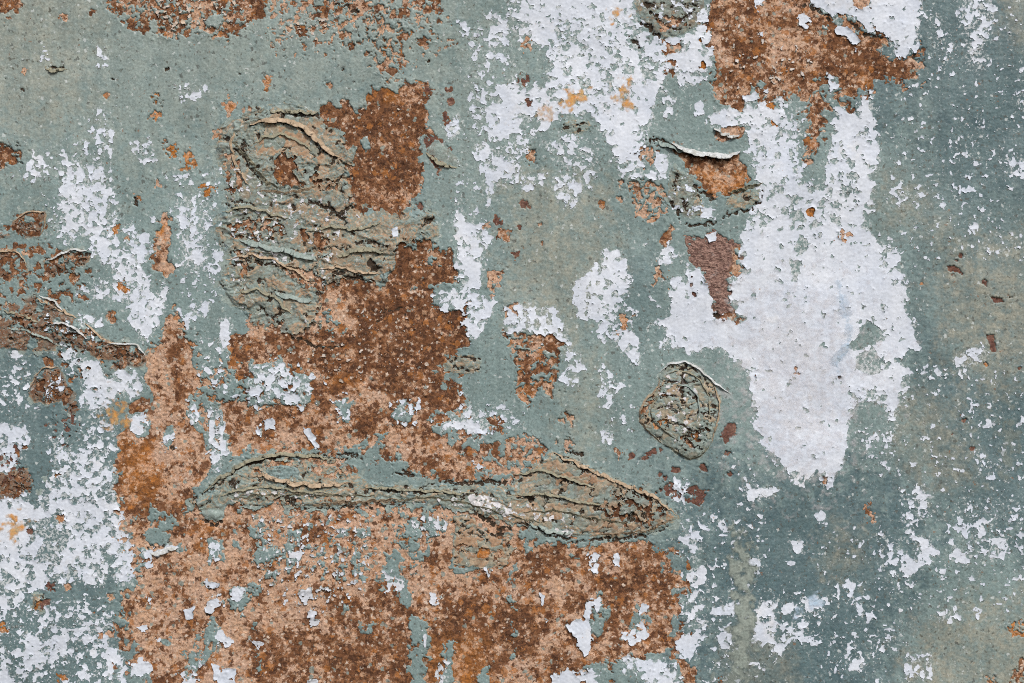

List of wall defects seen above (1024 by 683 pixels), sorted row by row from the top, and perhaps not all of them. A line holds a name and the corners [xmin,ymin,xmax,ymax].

rust [89,0,458,218]
rust [654,14,687,78]
rust [699,0,926,167]
peeling [11,109,360,343]
peeling [429,0,717,445]
rust [598,125,751,325]
peeling [0,313,178,683]
peeling [175,654,236,683]
peeling [183,578,246,620]
rust [0,212,709,683]
rust [680,423,737,472]
peeling [621,0,1024,683]